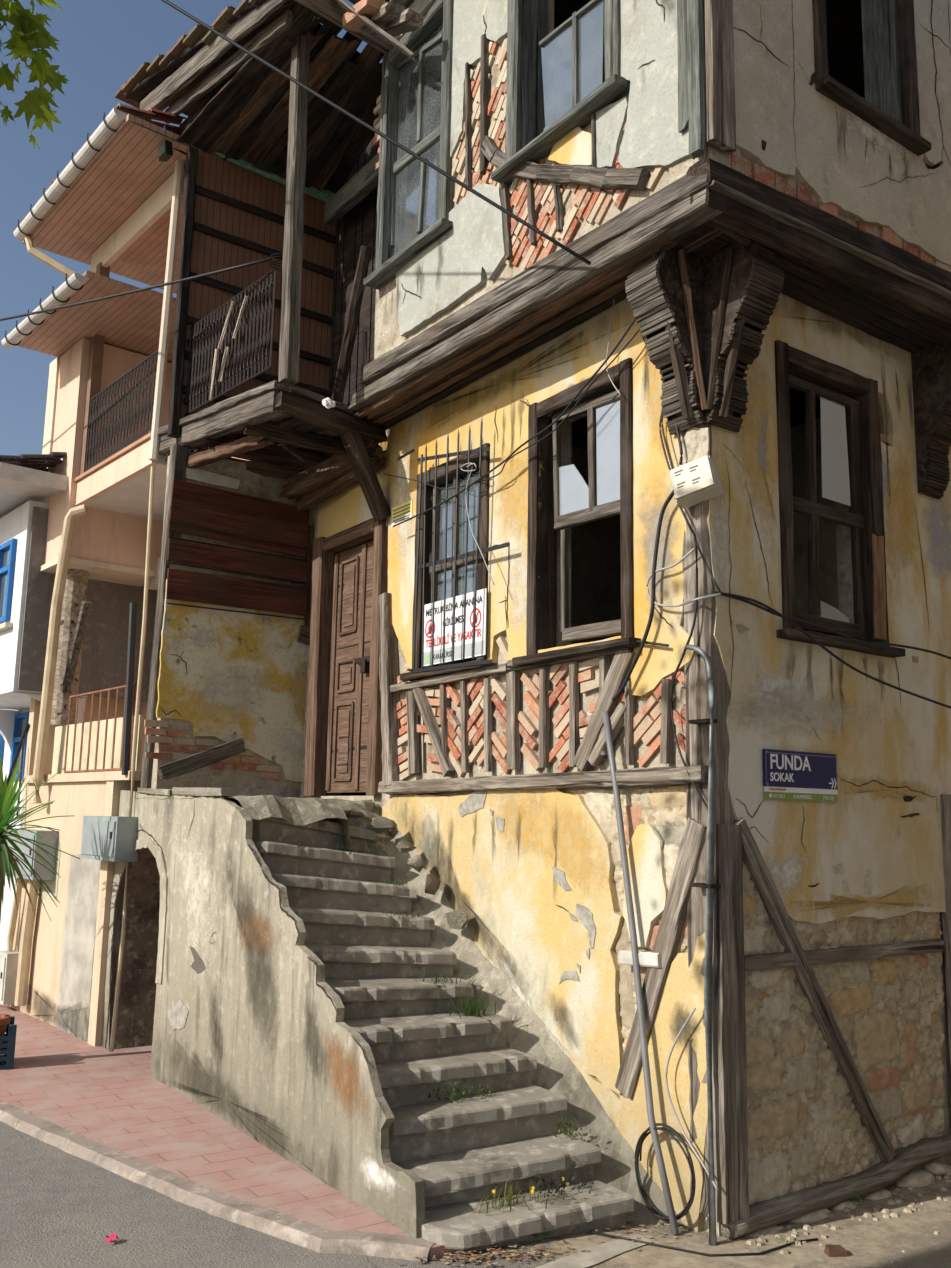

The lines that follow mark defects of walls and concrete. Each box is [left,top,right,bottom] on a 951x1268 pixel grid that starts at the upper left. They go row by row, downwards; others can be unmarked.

crack [861,0,951,188]
flaking render [451,38,631,270]
flaking render [645,166,665,190]
flaking render [731,140,838,217]
flaking render [856,220,951,272]
flaking render [144,720,218,760]
damp [175,838,213,951]
peeling [815,864,918,917]
damp [237,893,274,1028]
damp [187,1058,283,1148]
damp [306,1009,357,1107]
damp [362,1158,395,1188]